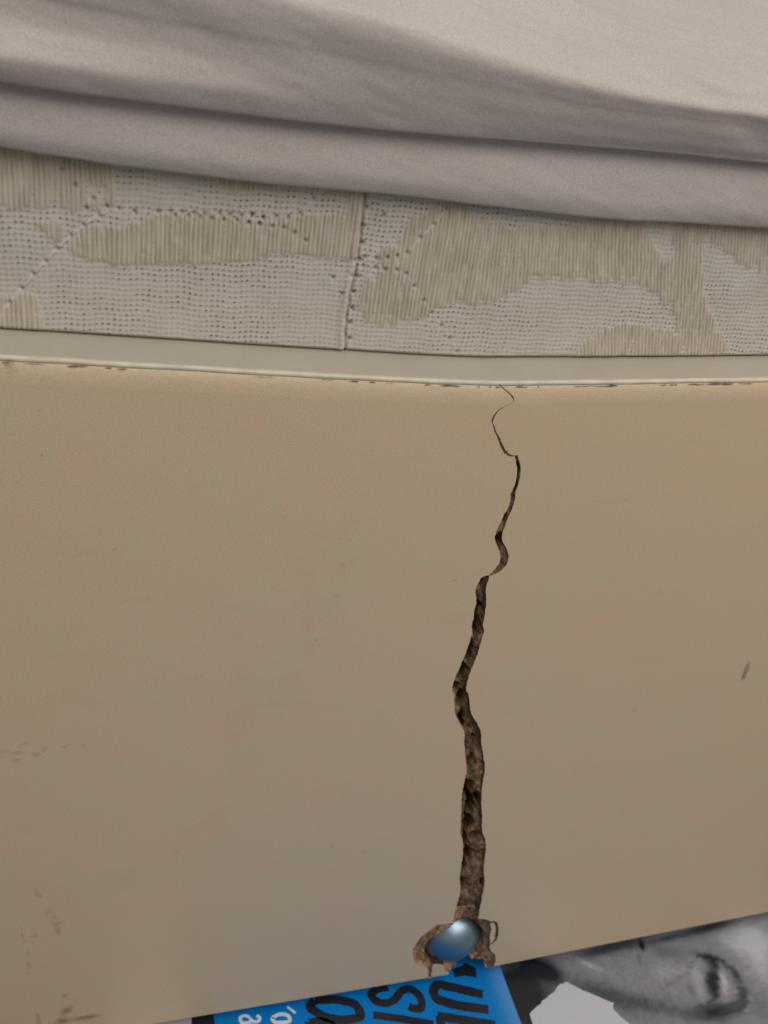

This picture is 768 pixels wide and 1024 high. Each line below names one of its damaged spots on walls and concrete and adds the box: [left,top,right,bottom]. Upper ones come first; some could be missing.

crack [452,384,521,914]